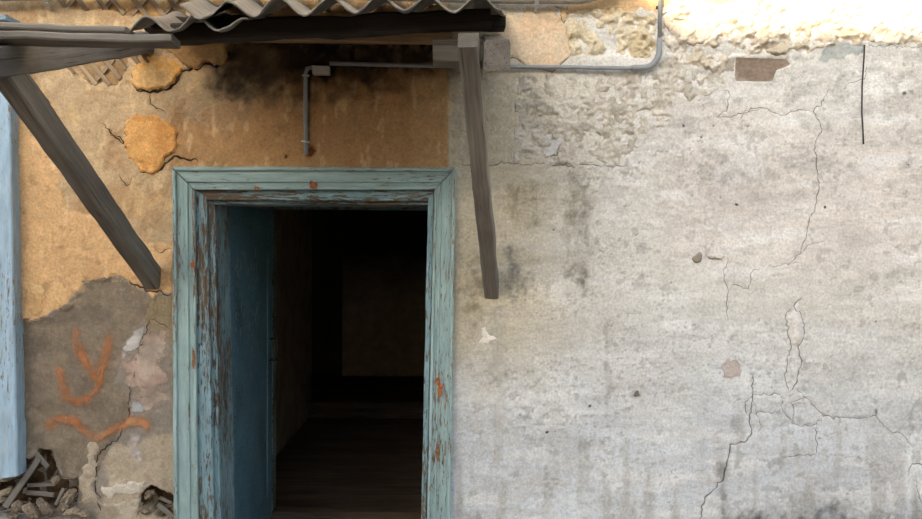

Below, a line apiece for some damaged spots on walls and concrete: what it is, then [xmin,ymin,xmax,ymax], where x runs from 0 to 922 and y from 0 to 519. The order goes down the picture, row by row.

peeling [124,114,178,175]
peeling [131,43,228,92]
damp [212,42,434,141]
flaking render [494,0,922,168]
crack [717,90,828,317]
peeling [0,277,174,519]
crack [700,296,922,518]